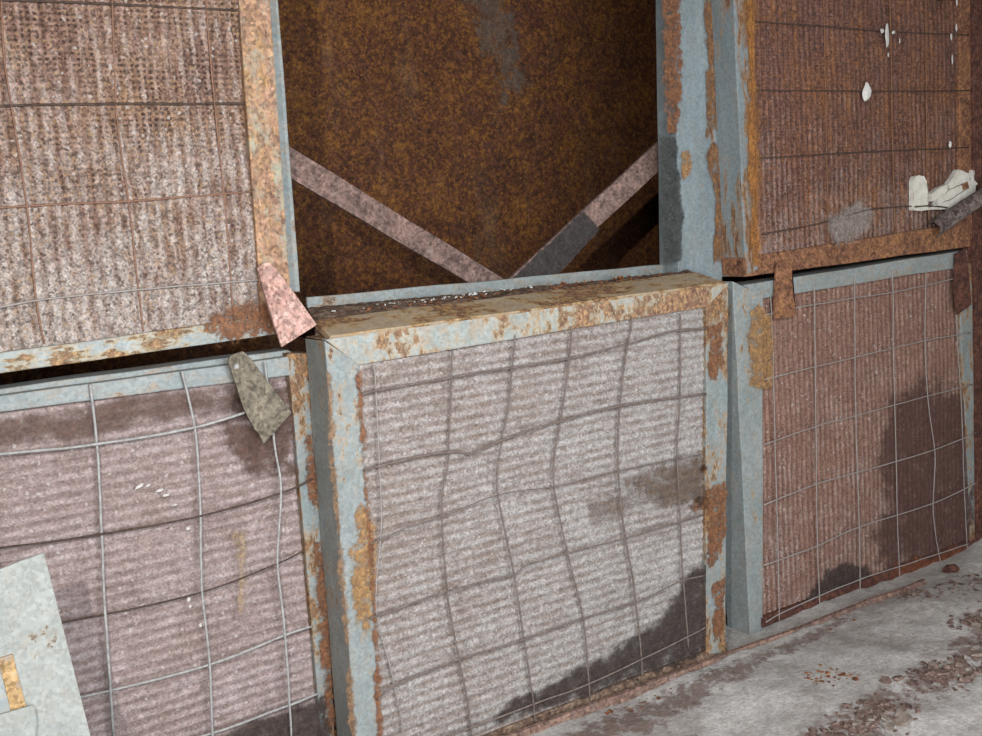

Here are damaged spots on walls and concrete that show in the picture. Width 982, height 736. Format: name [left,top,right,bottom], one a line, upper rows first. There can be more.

rust [662,0,683,134]
rust [681,151,694,179]
rust [704,0,723,265]
rust [747,0,761,266]
rust [204,301,275,341]
rust [707,322,724,381]
rust [748,304,774,389]
damp [0,378,309,477]
damp [806,378,975,601]
damp [493,553,731,724]
rust [711,577,726,643]